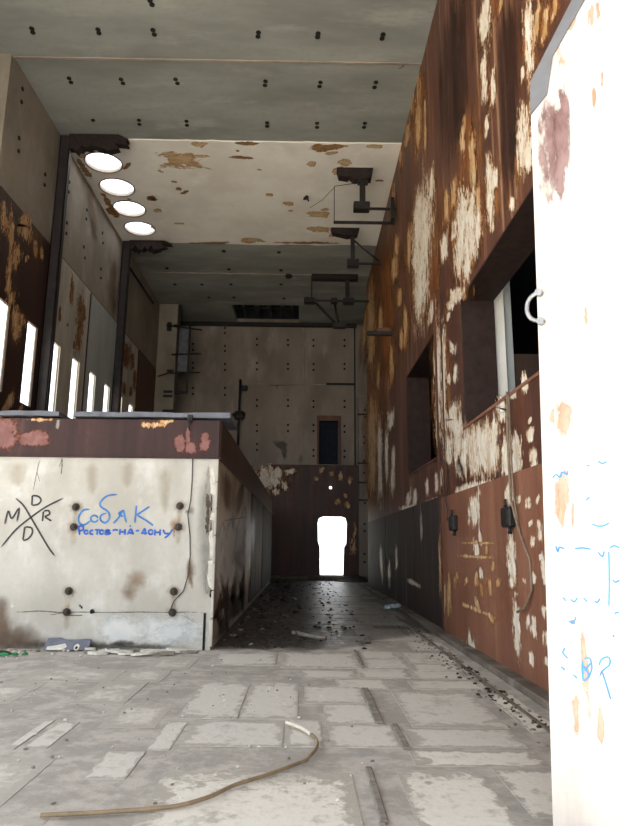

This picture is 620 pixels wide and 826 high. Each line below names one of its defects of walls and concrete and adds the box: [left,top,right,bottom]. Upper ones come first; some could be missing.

corrosion [439,0,477,197]
corrosion [499,11,517,182]
peeling [511,0,560,184]
corrosion [538,90,570,199]
corrosion [423,208,441,311]
peeling [311,0,548,669]
peeling [0,385,53,452]
peeling [141,419,174,429]
peeling [174,428,211,454]
water stain [216,510,245,594]
peeling [252,463,298,498]
corrosion [555,476,574,526]